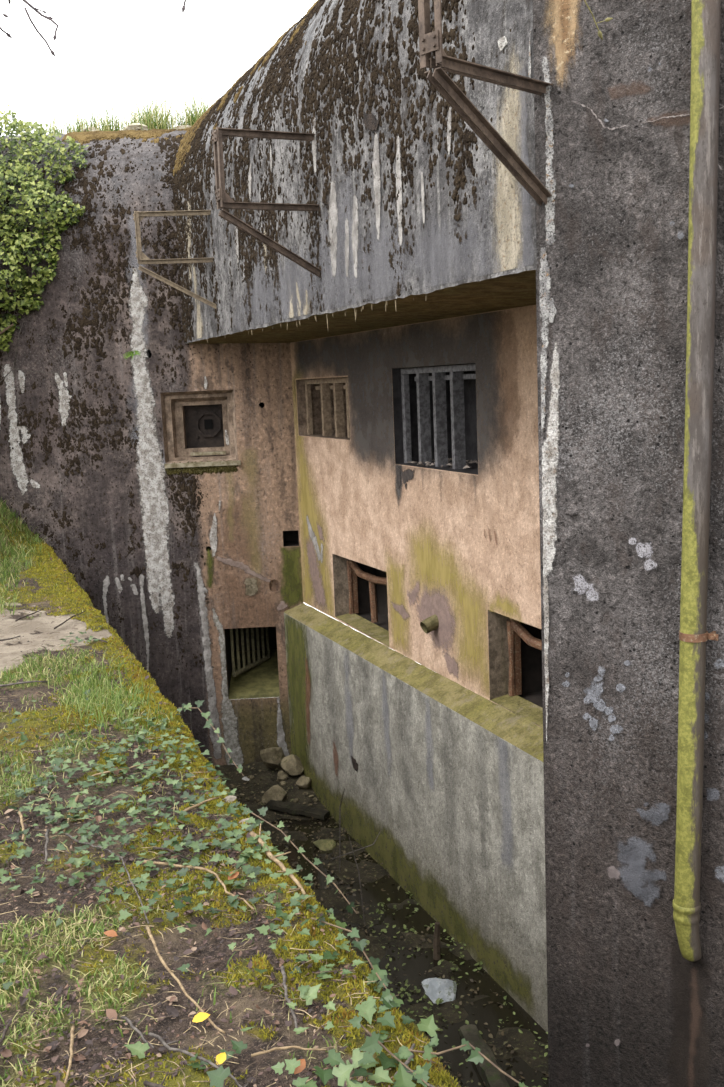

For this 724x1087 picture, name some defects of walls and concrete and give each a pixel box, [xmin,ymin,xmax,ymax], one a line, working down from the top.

rust [547,0,577,81]
water stain [243,134,534,324]
efflorescence [0,364,40,495]
efflorescence [102,268,175,671]
water stain [194,501,244,765]
water stain [277,312,531,1007]
water stain [542,342,560,743]
peeling [573,576,598,601]
peeling [583,666,623,741]
peeling [629,538,657,570]
peeling [618,837,667,906]
peeling [637,803,670,825]